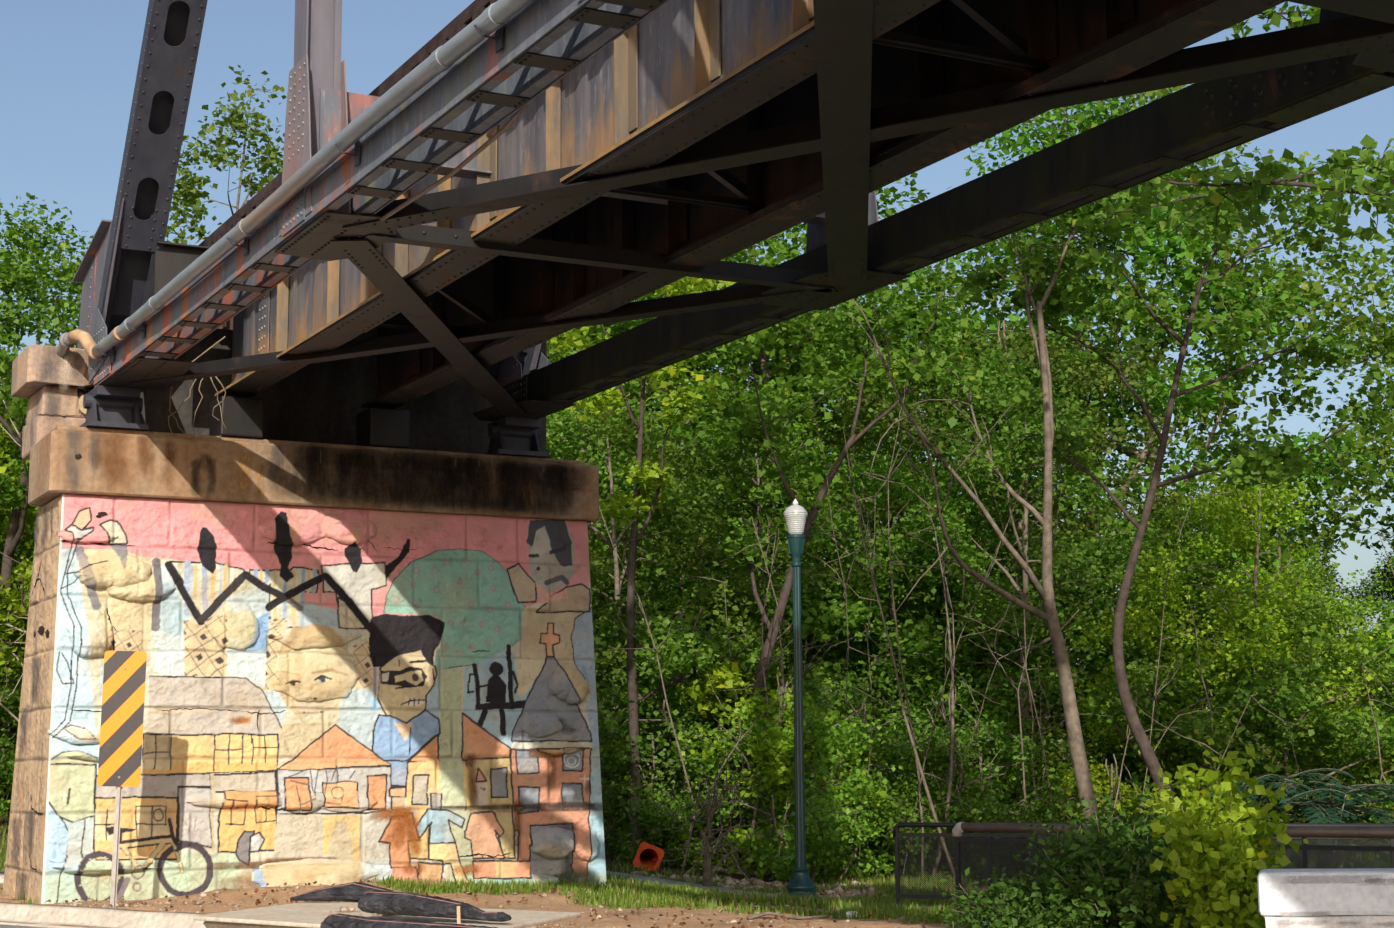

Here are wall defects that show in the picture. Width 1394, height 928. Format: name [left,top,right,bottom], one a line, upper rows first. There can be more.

damp [69,430,98,485]
damp [193,457,213,492]
damp [271,445,578,511]